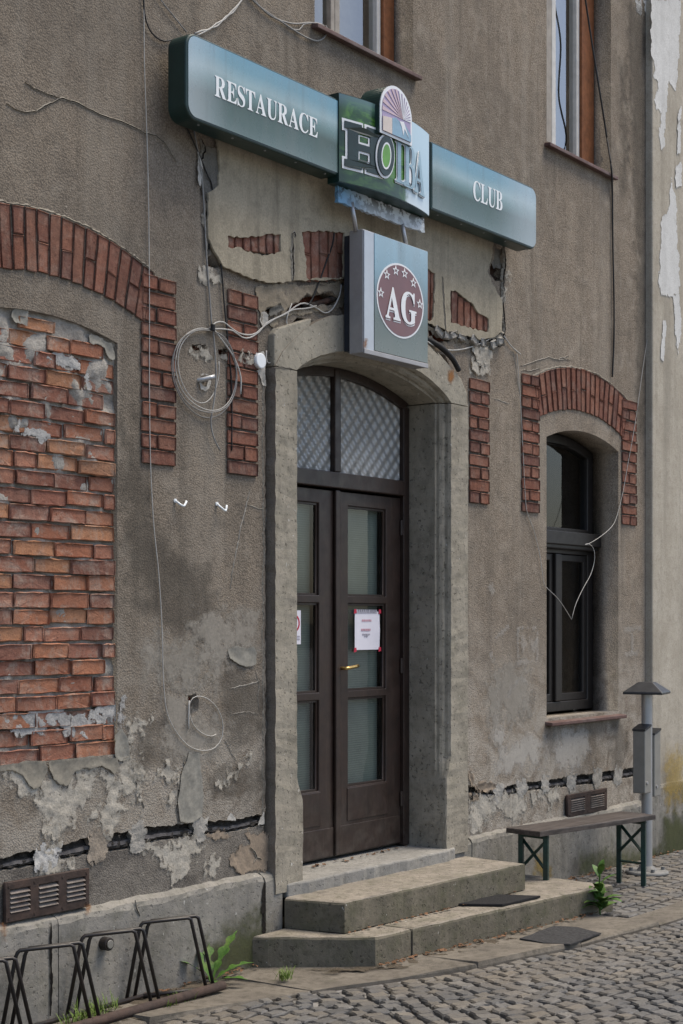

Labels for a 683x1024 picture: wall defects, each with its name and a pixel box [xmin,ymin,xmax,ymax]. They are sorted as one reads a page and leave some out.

crack [6,82,177,162]
flaking render [197,138,226,287]
flaking render [228,234,280,255]
flaking render [255,231,344,328]
flaking render [428,246,512,376]
peeling [635,0,682,361]
flaking render [0,694,181,876]
flaking render [142,808,269,887]
flaking render [215,751,252,789]
flaking render [468,766,560,834]